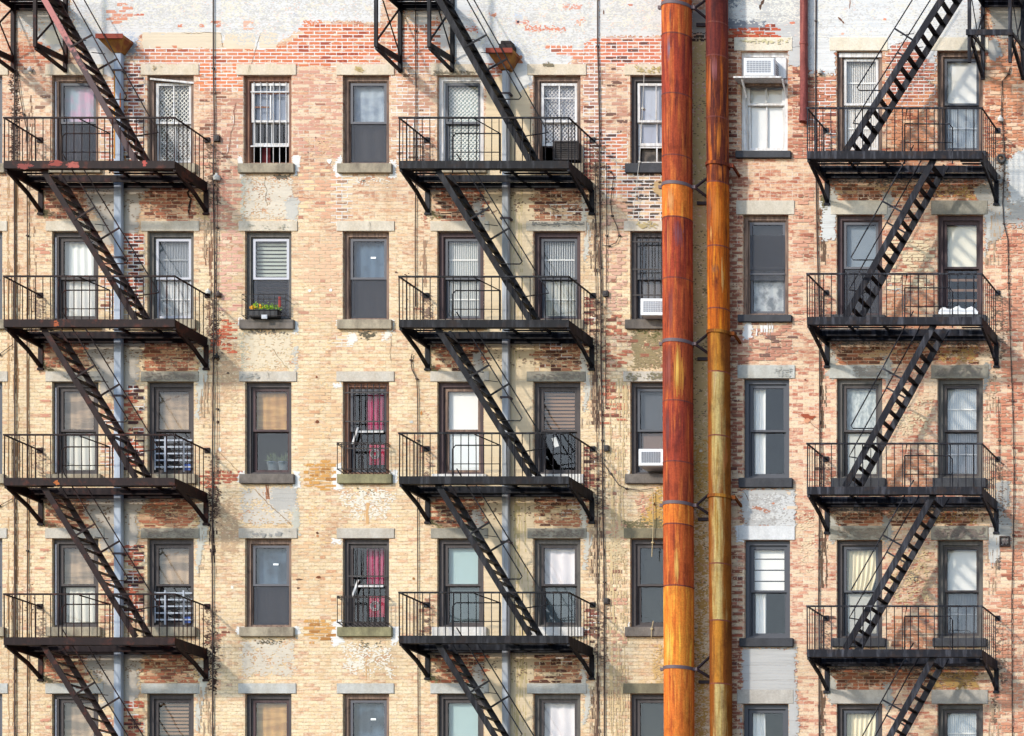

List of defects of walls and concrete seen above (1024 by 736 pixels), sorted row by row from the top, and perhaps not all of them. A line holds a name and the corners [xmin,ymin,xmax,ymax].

flaking render [71,0,446,353]
flaking render [466,0,661,424]
flaking render [728,22,836,524]